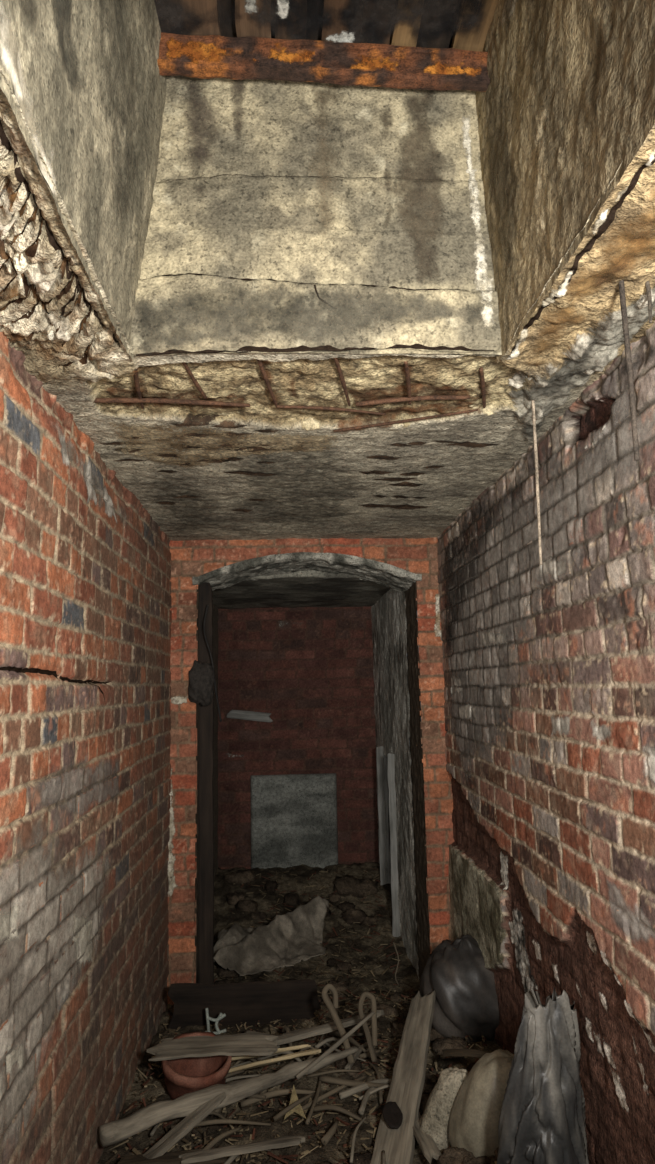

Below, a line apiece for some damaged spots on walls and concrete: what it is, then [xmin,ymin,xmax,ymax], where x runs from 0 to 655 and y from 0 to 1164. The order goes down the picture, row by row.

peeling [277,0,289,19]
rust [270,43,315,62]
water stain [251,0,486,48]
rust [424,62,481,76]
crack [0,120,655,360]
water stain [462,117,494,327]
water stain [140,289,449,346]
spalling [0,94,655,476]
rust [339,365,488,432]
peeling [359,440,498,510]
crack [0,666,109,701]
spalling [451,778,655,1164]